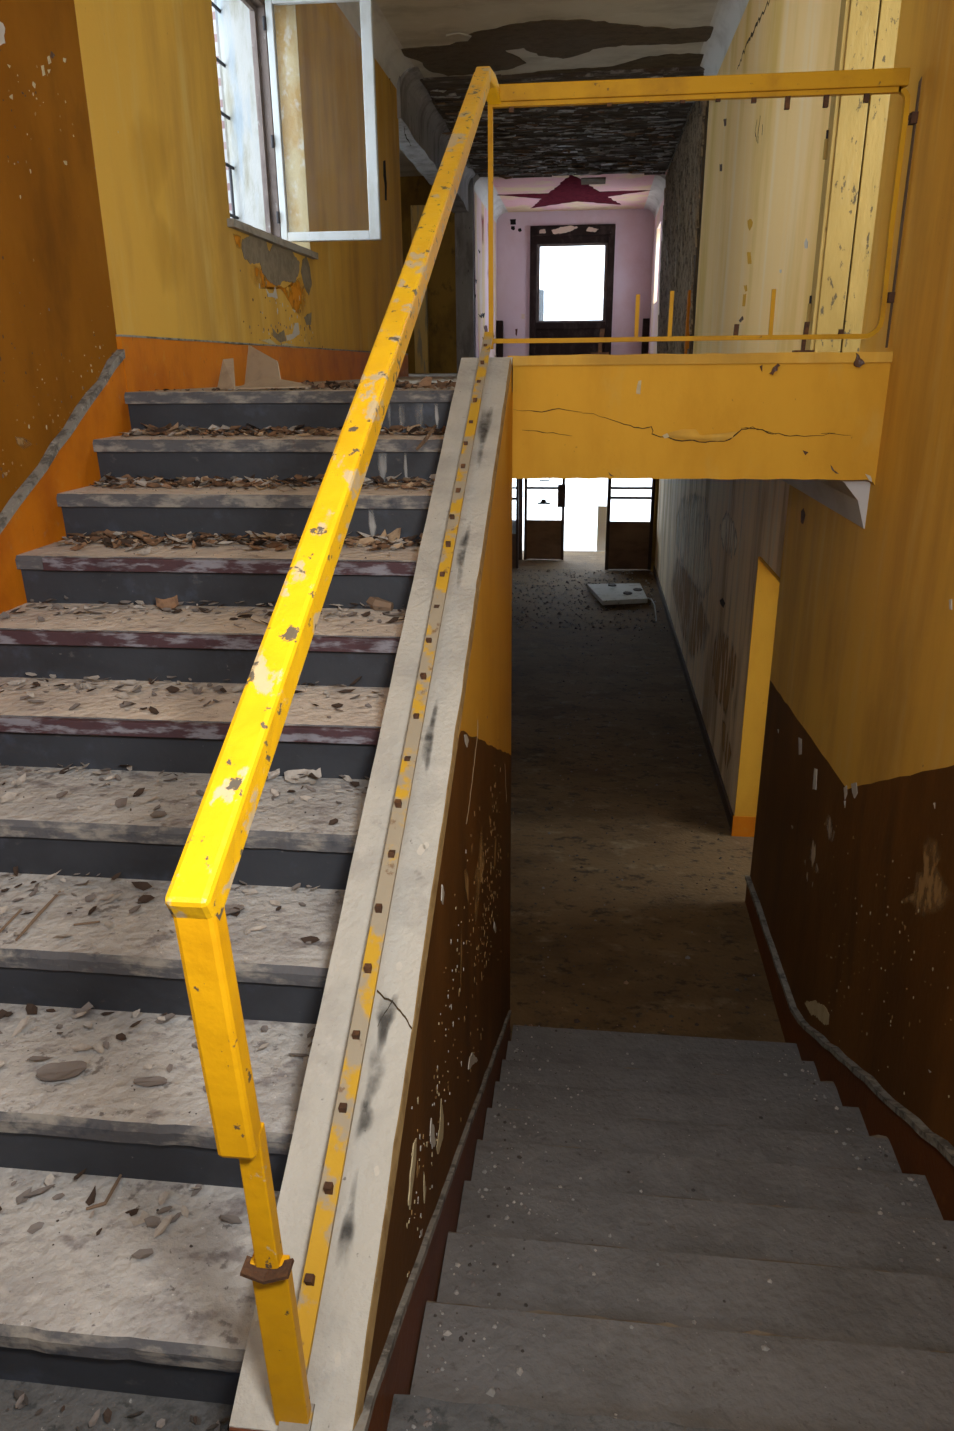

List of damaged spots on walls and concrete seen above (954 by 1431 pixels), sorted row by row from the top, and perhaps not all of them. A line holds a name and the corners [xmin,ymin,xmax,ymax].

flaking render [401,19,713,76]
peeling [0,22,74,173]
flaking render [241,235,312,299]
flaking render [261,309,312,346]
crack [513,408,840,443]